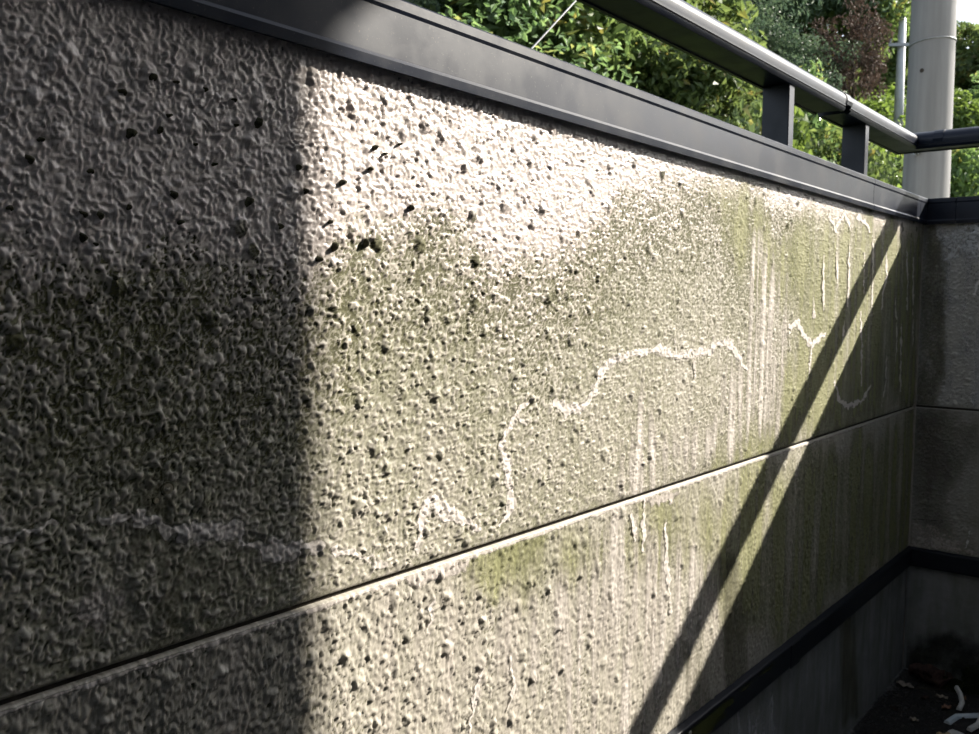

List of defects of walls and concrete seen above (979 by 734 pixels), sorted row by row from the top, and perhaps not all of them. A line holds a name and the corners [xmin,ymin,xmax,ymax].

crack [414,336,748,554]
crack [0,518,59,544]
crack [97,509,389,570]
crack [630,498,673,615]
crack [427,597,436,635]
water stain [531,509,711,734]
water stain [725,563,742,680]
crack [469,665,486,732]
crack [508,653,517,707]